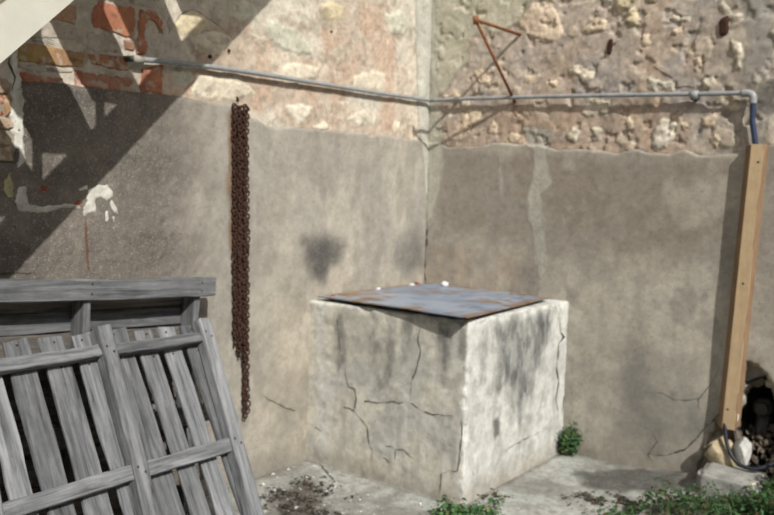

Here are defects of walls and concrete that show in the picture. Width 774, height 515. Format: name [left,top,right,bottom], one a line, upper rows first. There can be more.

spalling [17,0,164,95]
spalling [0,78,14,162]
peeling [3,173,118,228]
crack [337,320,463,494]
leakage [500,317,549,391]
crack [556,327,565,411]
crack [644,369,719,462]
spalling [733,368,774,475]